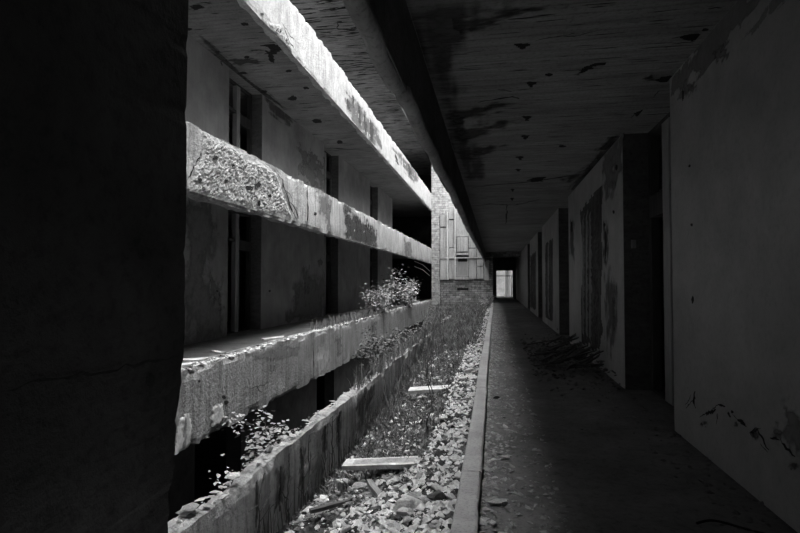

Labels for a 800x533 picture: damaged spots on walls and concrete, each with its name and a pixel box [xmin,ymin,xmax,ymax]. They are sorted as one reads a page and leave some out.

leakage [345,91,382,149]
leakage [411,5,544,179]
spalling [187,131,292,220]
leakage [392,147,418,182]
leakage [343,205,377,248]
leakage [603,222,617,346]
peeling [175,412,193,455]
peeling [210,395,229,431]